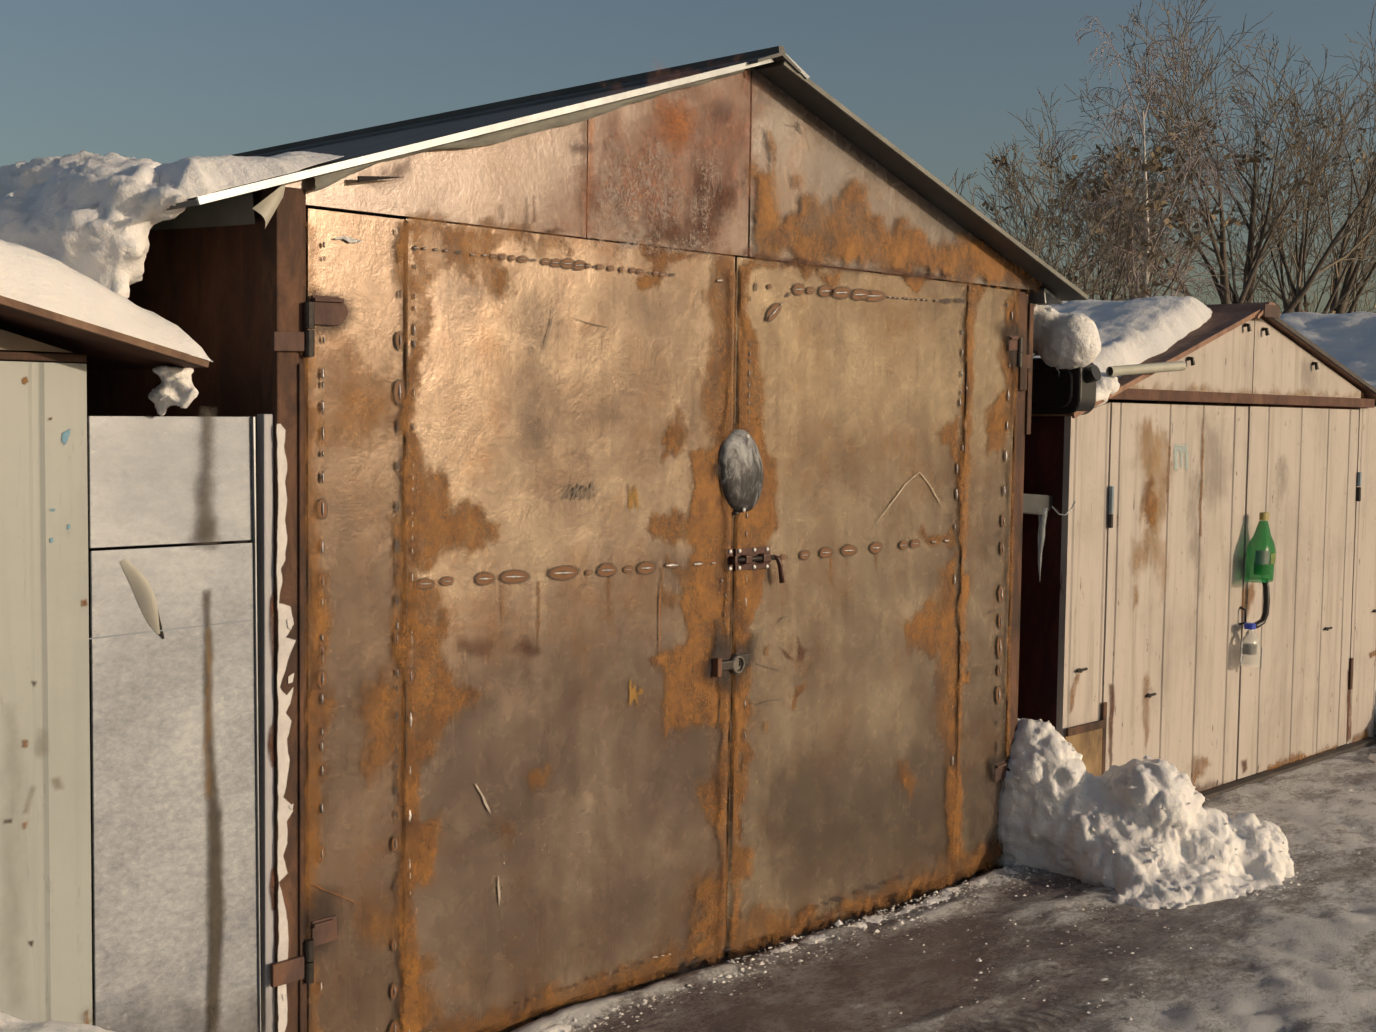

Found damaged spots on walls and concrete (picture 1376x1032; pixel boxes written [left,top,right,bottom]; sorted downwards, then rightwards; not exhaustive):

leakage [205,592,224,1032]
rust [303,348,322,911]
rust [392,196,572,1032]
rust [447,126,1041,1032]
rust [1142,424,1170,527]